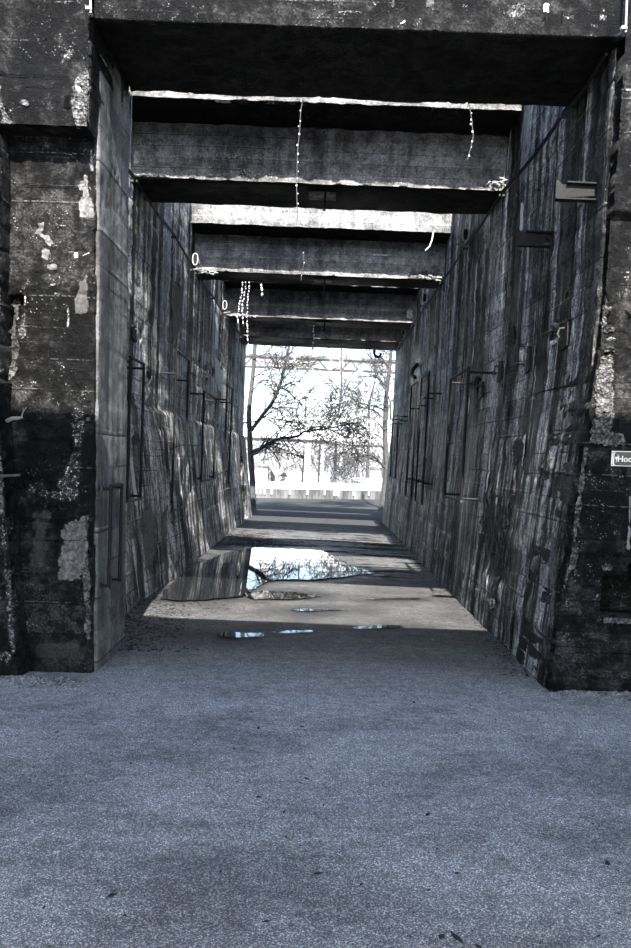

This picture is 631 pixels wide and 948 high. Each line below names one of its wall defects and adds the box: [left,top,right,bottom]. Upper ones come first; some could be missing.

spalling [590,300,616,434]
spalling [562,447,588,588]
spalling [82,547,91,640]